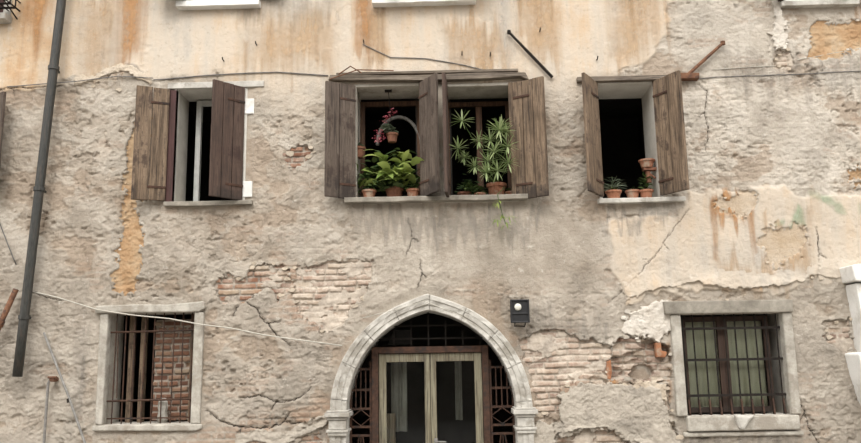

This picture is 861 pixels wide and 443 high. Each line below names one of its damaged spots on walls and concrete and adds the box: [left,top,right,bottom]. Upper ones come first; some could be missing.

spalling [772,20,794,72]
flaking render [807,19,861,60]
flaking render [110,122,145,296]
rust [712,190,738,229]
spalling [214,259,374,335]
spalling [519,329,684,443]